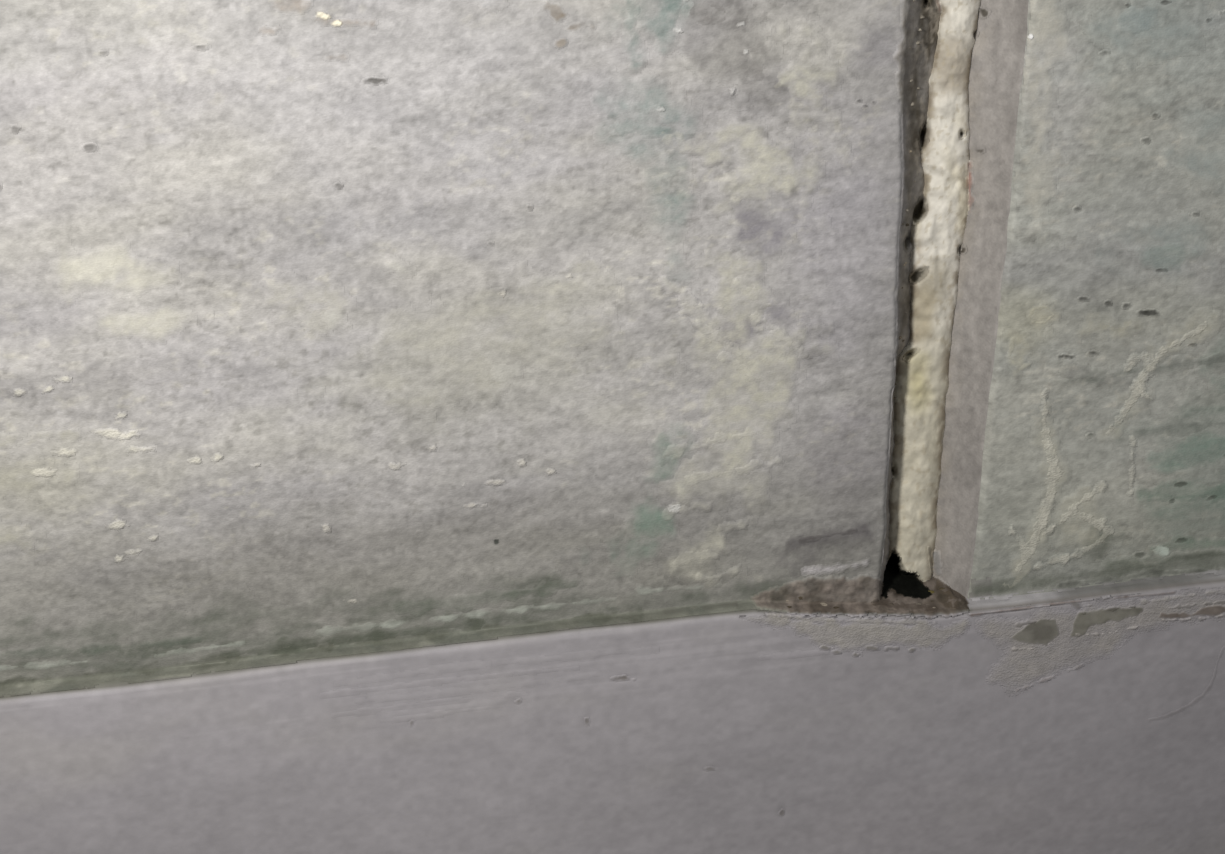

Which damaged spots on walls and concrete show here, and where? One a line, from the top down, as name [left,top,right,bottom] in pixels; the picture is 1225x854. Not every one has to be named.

water stain [0,0,876,697]
spalling [749,546,969,621]
peeling [1010,605,1143,652]
peeling [1159,600,1225,623]